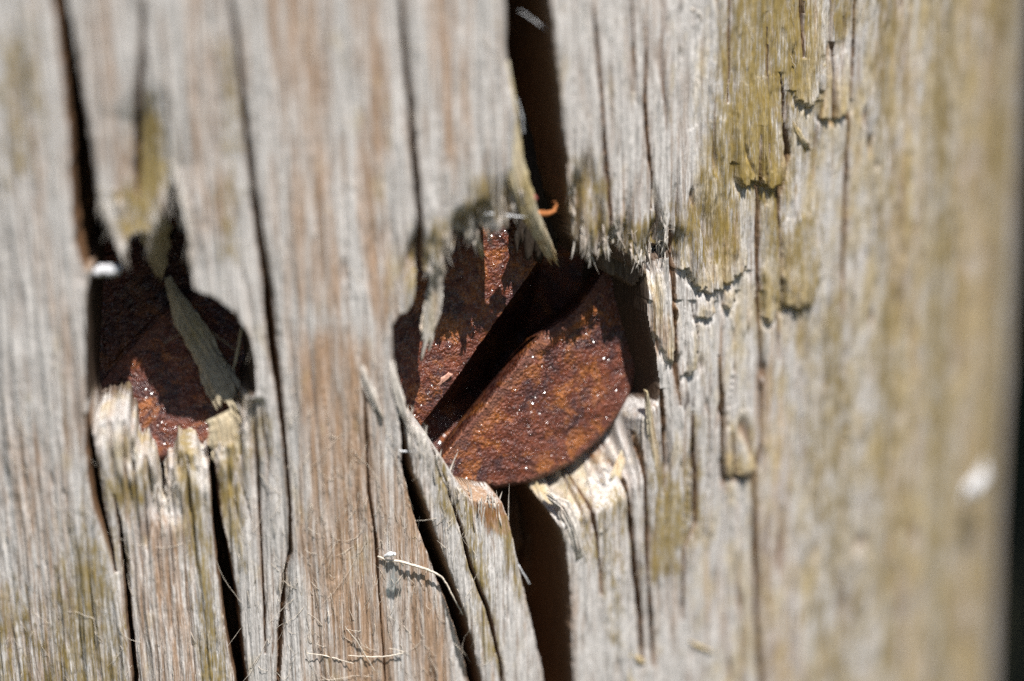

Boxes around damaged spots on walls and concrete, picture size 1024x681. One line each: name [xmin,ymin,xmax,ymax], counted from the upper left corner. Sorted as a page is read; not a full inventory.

crack [52,0,98,272]
crack [505,0,572,230]
crack [207,0,293,681]
crack [400,415,505,681]
crack [485,482,574,681]